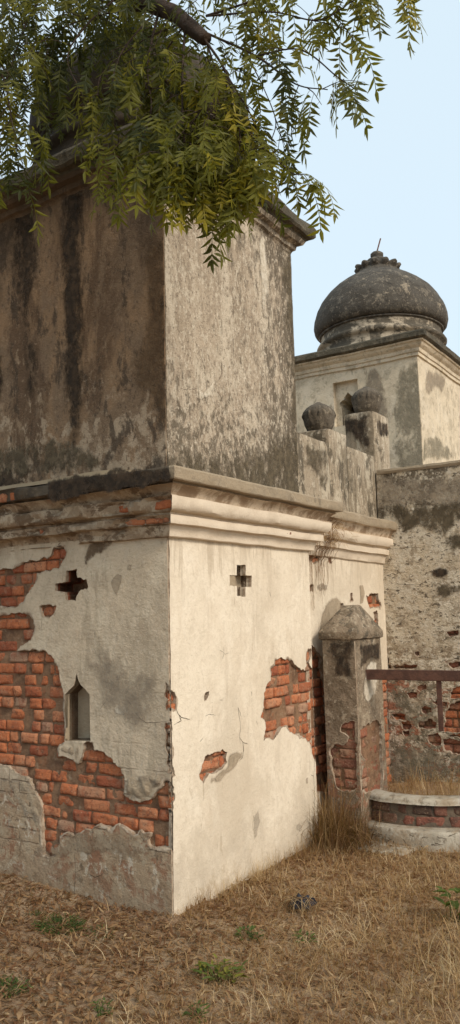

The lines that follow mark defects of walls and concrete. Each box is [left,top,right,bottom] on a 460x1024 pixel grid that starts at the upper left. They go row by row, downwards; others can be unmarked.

water stain [260,236,268,316]
water stain [0,191,98,477]
water stain [134,241,165,419]
water stain [168,252,299,493]
water stain [426,373,445,392]
water stain [423,438,452,460]
flaking render [119,500,172,526]
flaking render [340,585,382,622]
flaking render [0,544,178,858]
flaking render [261,645,460,794]
flaking render [199,750,242,782]